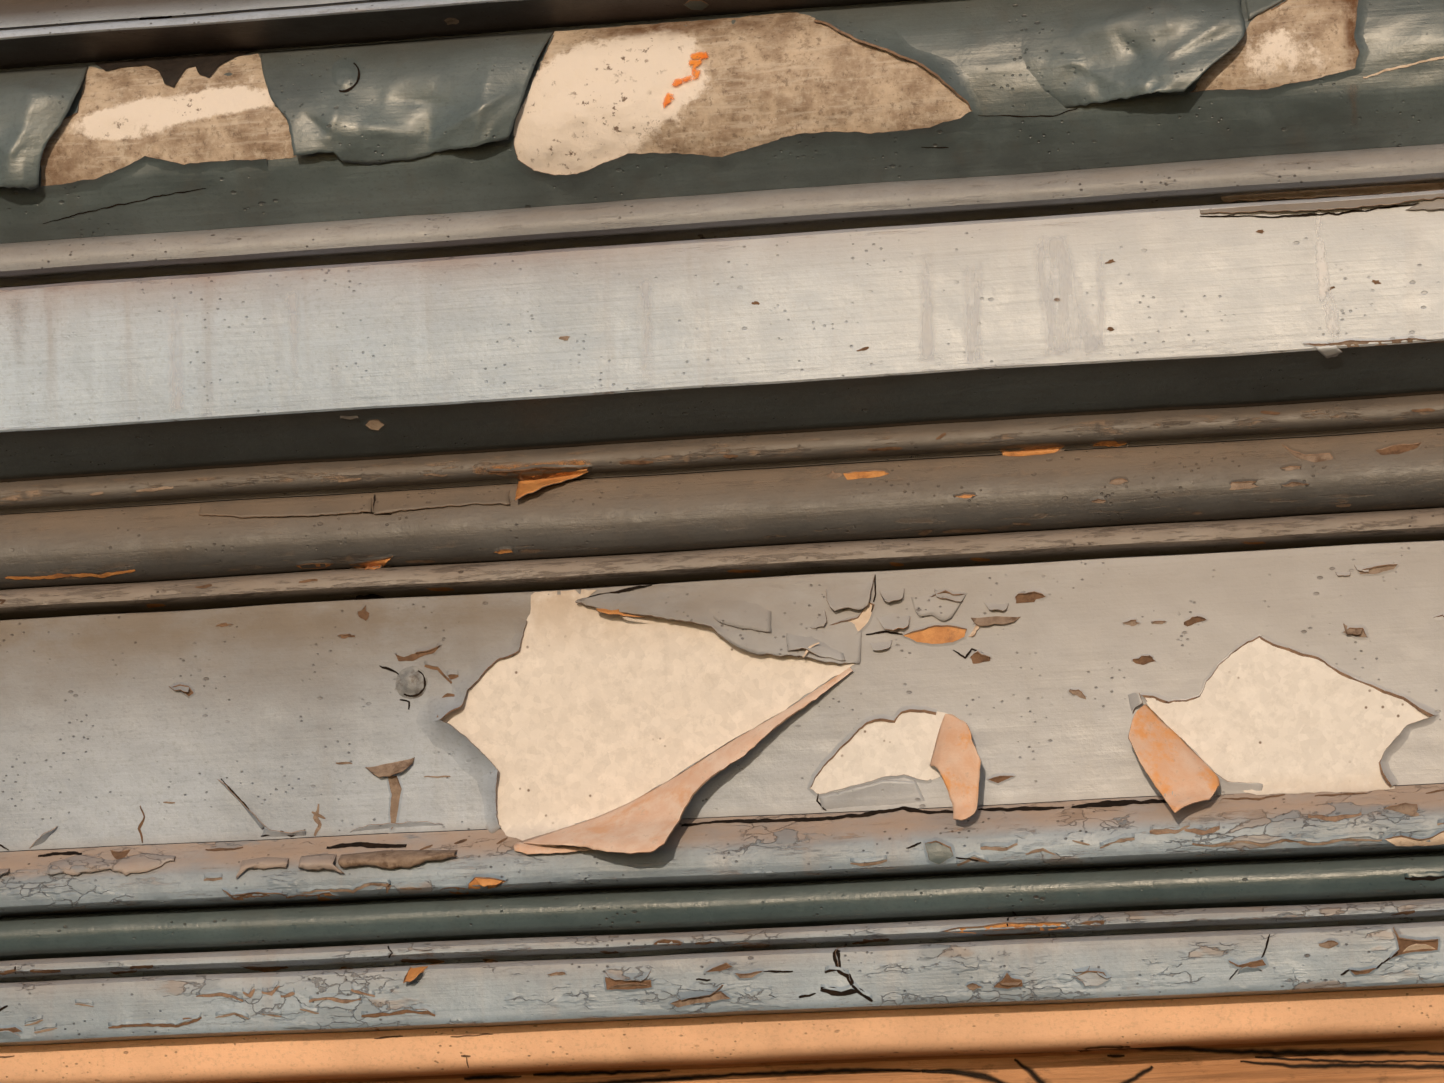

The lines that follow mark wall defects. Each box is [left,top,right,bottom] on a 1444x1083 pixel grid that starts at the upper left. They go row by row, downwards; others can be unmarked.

peeling [1021,0,1370,108]
peeling [0,0,983,198]
peeling [1200,182,1444,233]
peeling [1340,623,1370,640]
peeling [416,578,1048,855]
peeling [1128,633,1440,816]
peeling [1382,827,1444,849]
peeling [603,970,654,992]
peeling [668,940,793,1011]
peeling [964,969,1025,991]
peeling [1226,934,1270,980]
peeling [1340,925,1441,977]